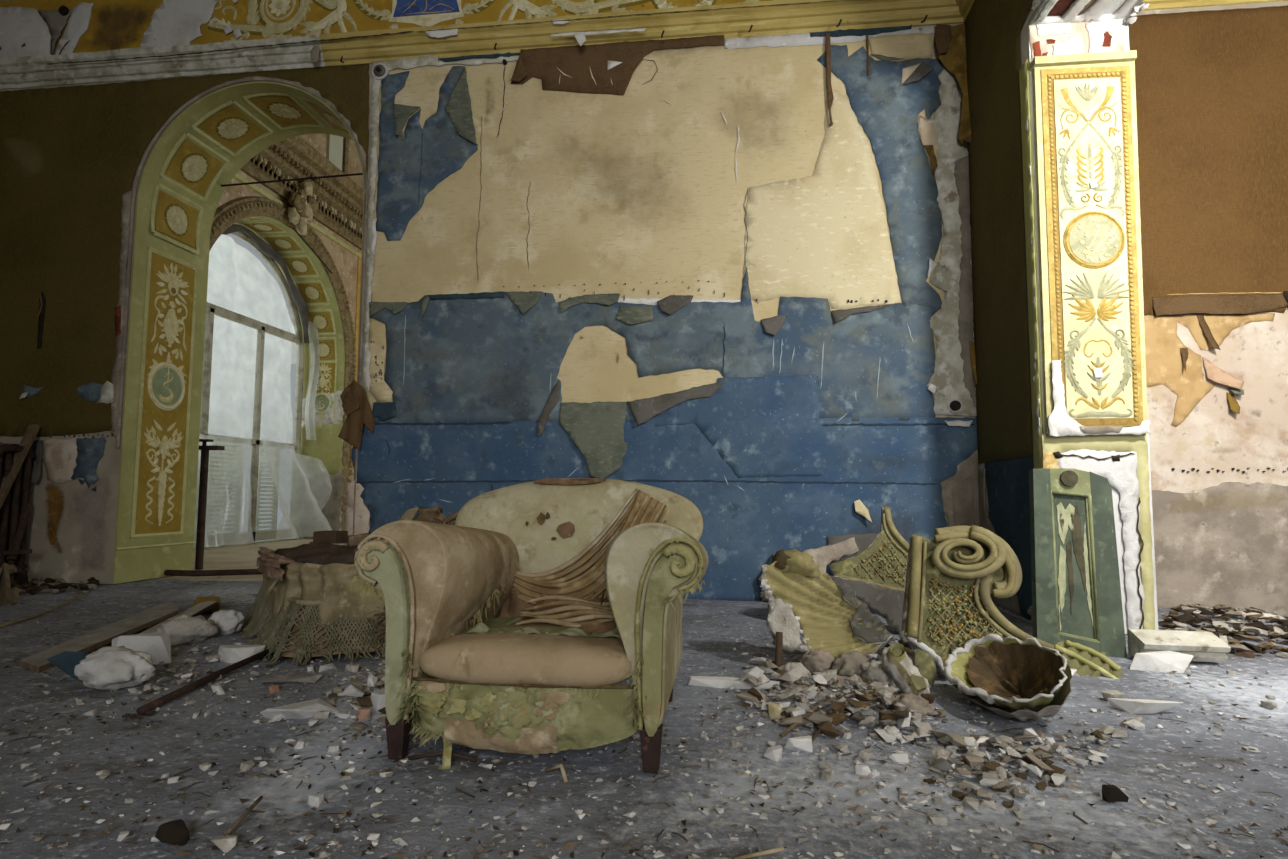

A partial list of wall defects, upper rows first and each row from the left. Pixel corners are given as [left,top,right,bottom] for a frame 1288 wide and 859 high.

flaking render [55,2,94,55]
peeling [141,0,242,47]
flaking render [724,25,935,49]
flaking render [1028,0,1149,61]
flaking render [110,55,519,448]
peeling [917,68,977,427]
flaking render [43,437,96,492]
flaking render [344,447,370,535]
flaking render [941,450,995,533]
flaking render [1033,310,1288,631]
flaking render [991,593,1021,616]